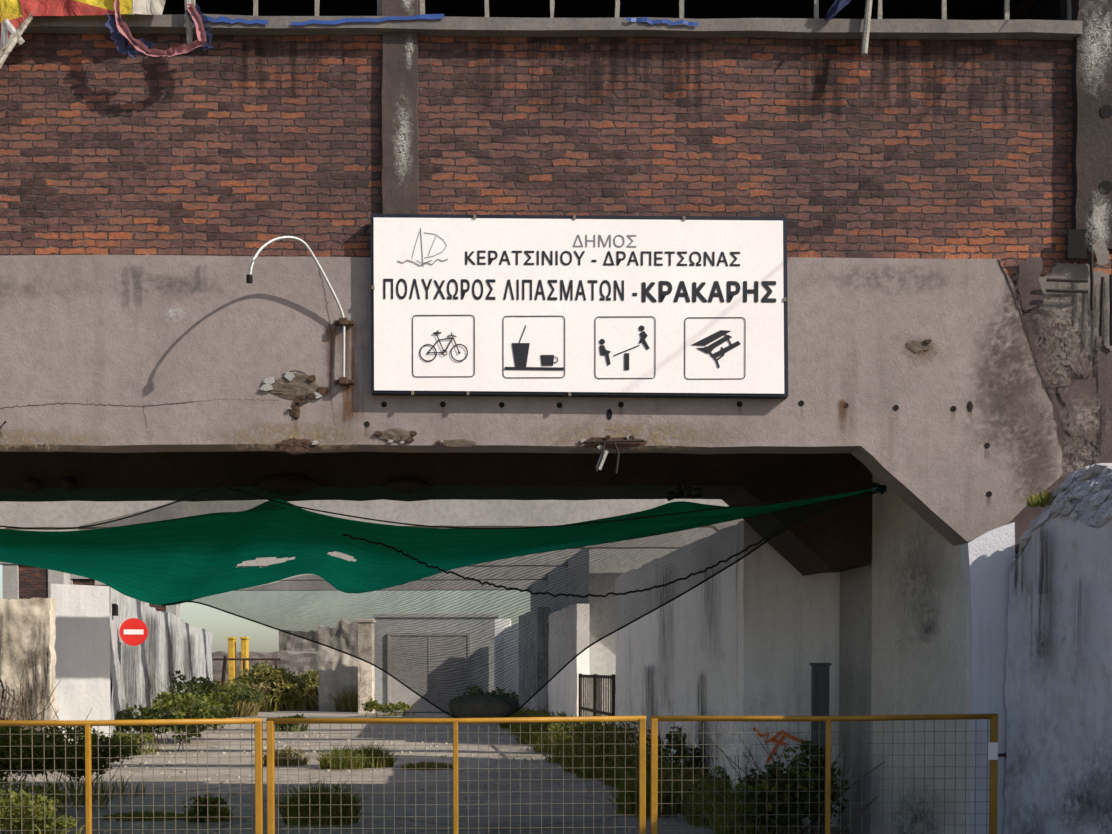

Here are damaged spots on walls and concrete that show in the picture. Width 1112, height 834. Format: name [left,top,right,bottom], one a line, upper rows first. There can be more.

spalling [260,371,328,404]
rust [236,327,355,445]
spalling [374,428,417,444]
leakage [986,276,1056,492]
leakage [25,623,49,729]